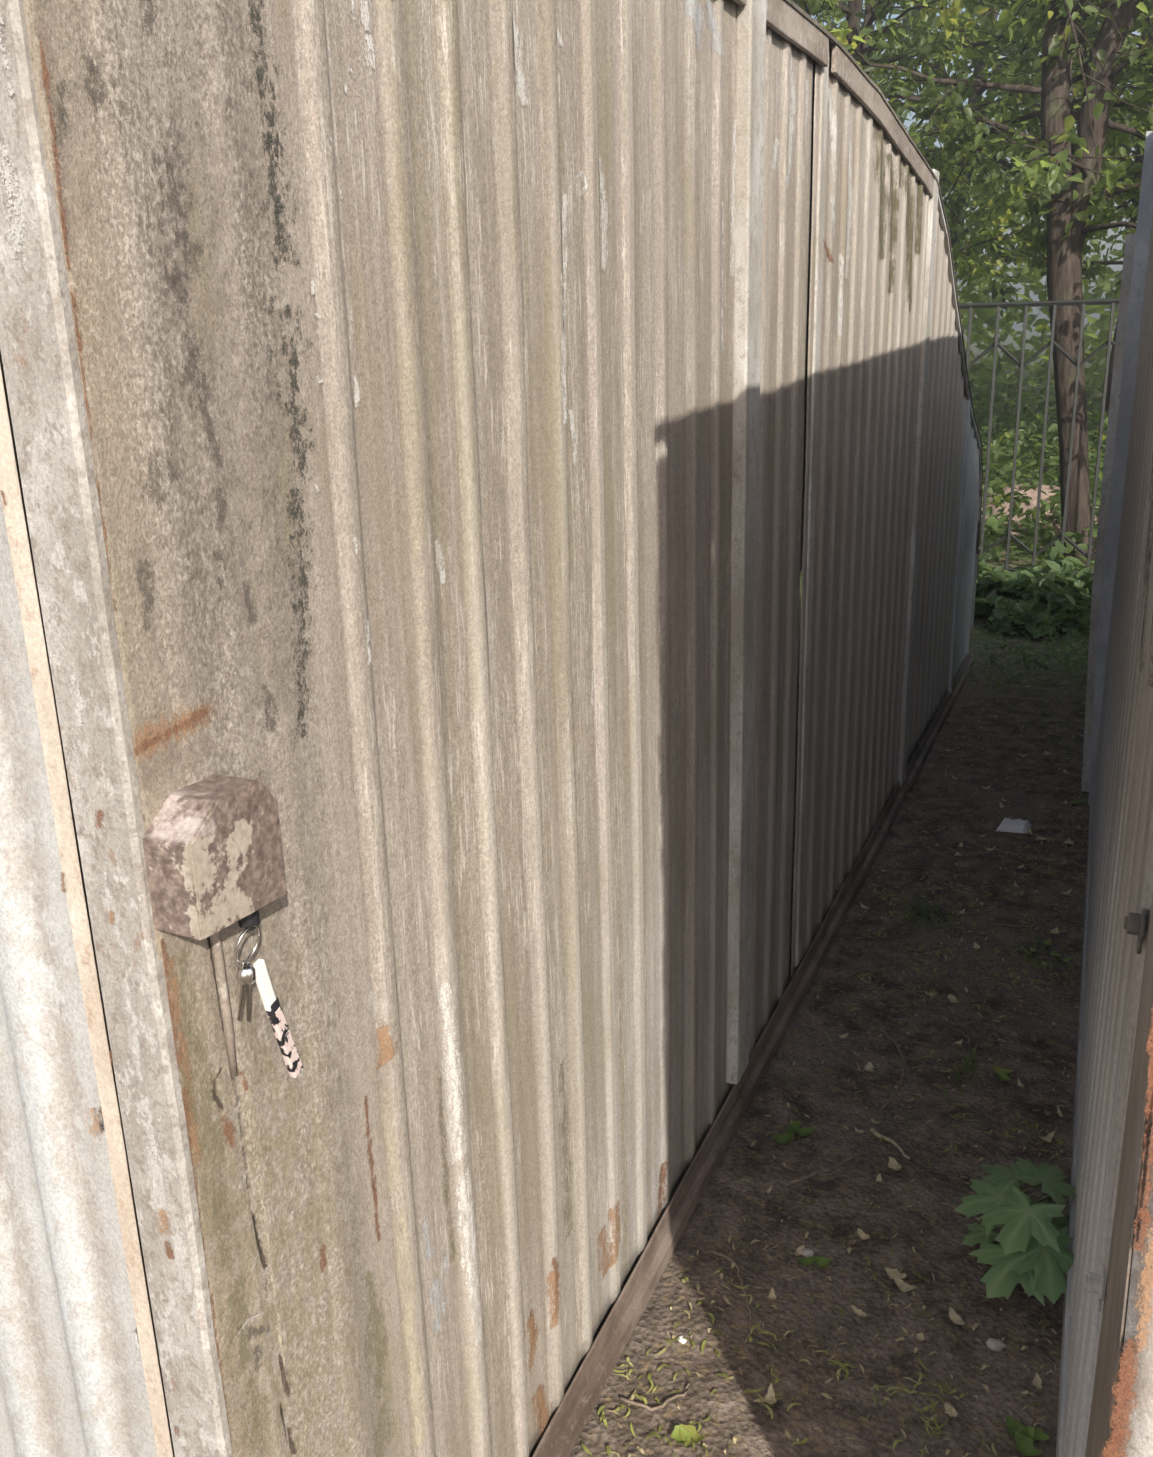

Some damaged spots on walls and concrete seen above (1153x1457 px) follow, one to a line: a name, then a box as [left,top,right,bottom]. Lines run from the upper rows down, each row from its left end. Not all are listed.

leakage [50,38,120,146]
leakage [150,118,214,410]
leakage [873,125,924,312]
corrosion [132,700,216,789]
corrosion [1144,1004,1153,1116]
corrosion [597,1201,620,1278]
corrosion [1101,1207,1153,1457]